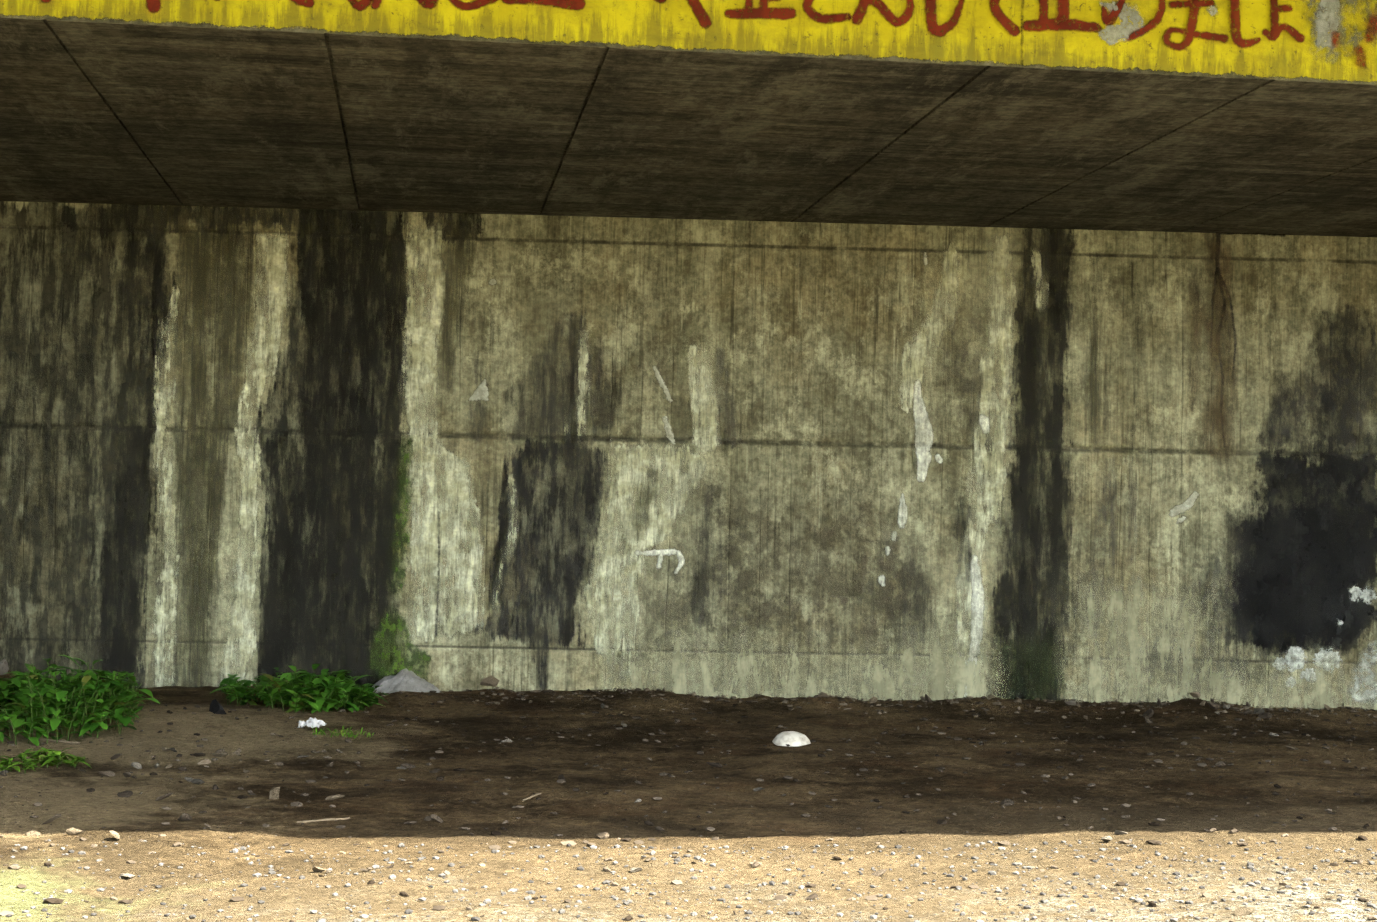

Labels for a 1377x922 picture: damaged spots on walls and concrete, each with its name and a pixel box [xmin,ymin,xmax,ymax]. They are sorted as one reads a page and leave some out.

peeling [1307,0,1377,64]
water stain [0,201,1377,710]